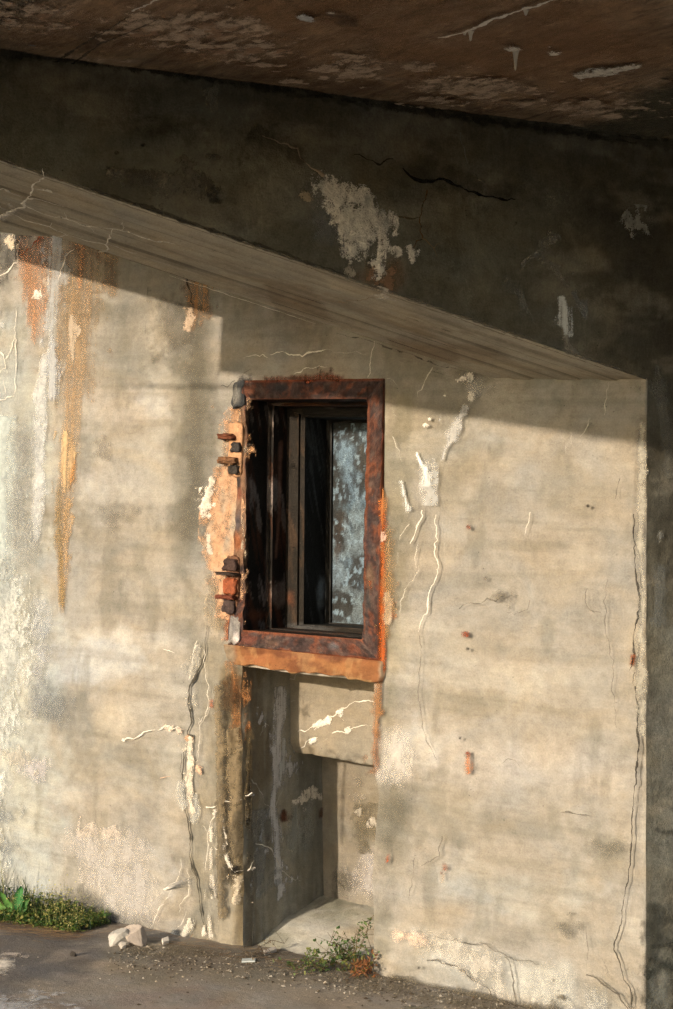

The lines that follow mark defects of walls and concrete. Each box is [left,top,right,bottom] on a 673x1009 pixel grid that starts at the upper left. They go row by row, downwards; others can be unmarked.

water stain [572,64,641,79]
water stain [0,232,32,283]
corrosion [183,279,210,332]
peeling [357,260,403,293]
corrosion [32,241,117,605]
water stain [0,416,10,576]
crack [399,510,439,632]
crack [122,625,255,932]
corrosion [224,661,251,740]
crack [301,700,373,748]
crack [586,514,641,1009]
water stain [630,903,673,1009]